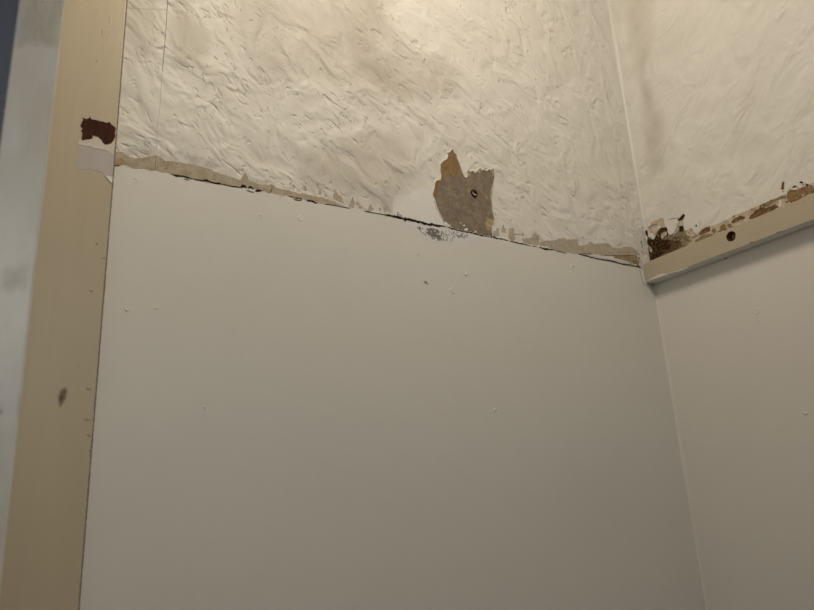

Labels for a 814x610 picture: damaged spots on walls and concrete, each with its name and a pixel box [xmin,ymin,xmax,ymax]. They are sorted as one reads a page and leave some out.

flaking render [80,117,387,212]
crack [172,174,641,268]
peeling [417,148,642,268]
flaking render [688,181,814,245]